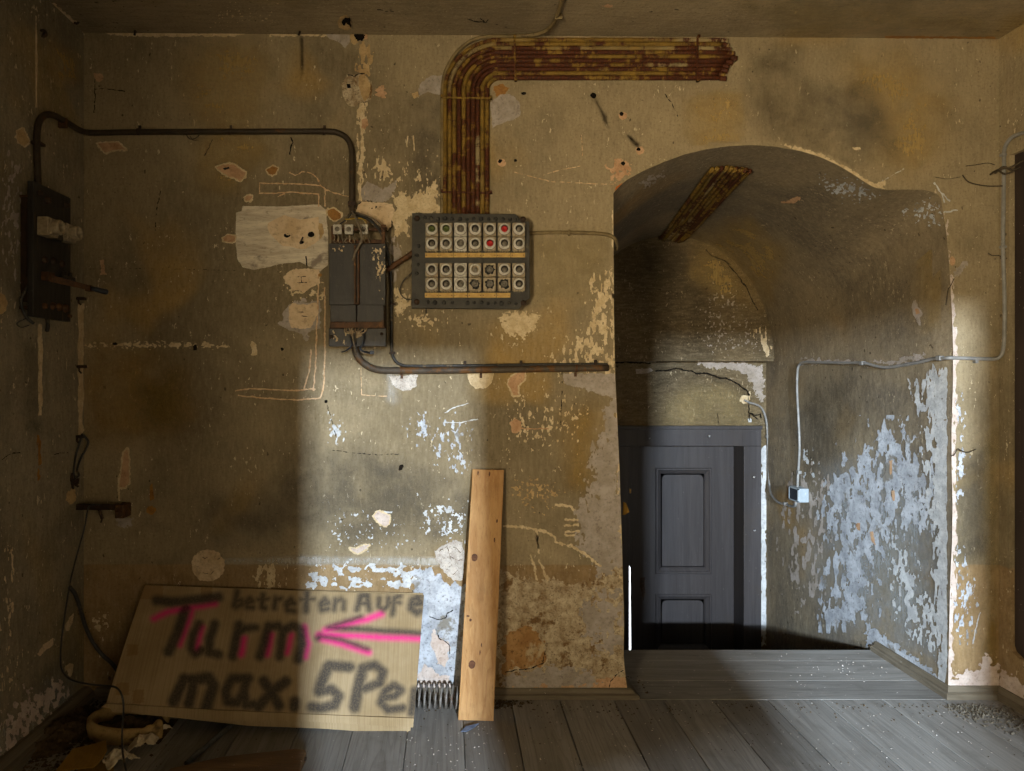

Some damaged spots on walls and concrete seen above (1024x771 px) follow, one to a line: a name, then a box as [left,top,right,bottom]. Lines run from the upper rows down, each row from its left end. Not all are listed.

spalling [341,18,448,332]
peeling [544,266,615,377]
crack [706,249,758,310]
crack [615,362,762,420]
peeling [776,250,979,685]
flaking render [496,373,627,688]
spalling [417,629,451,688]